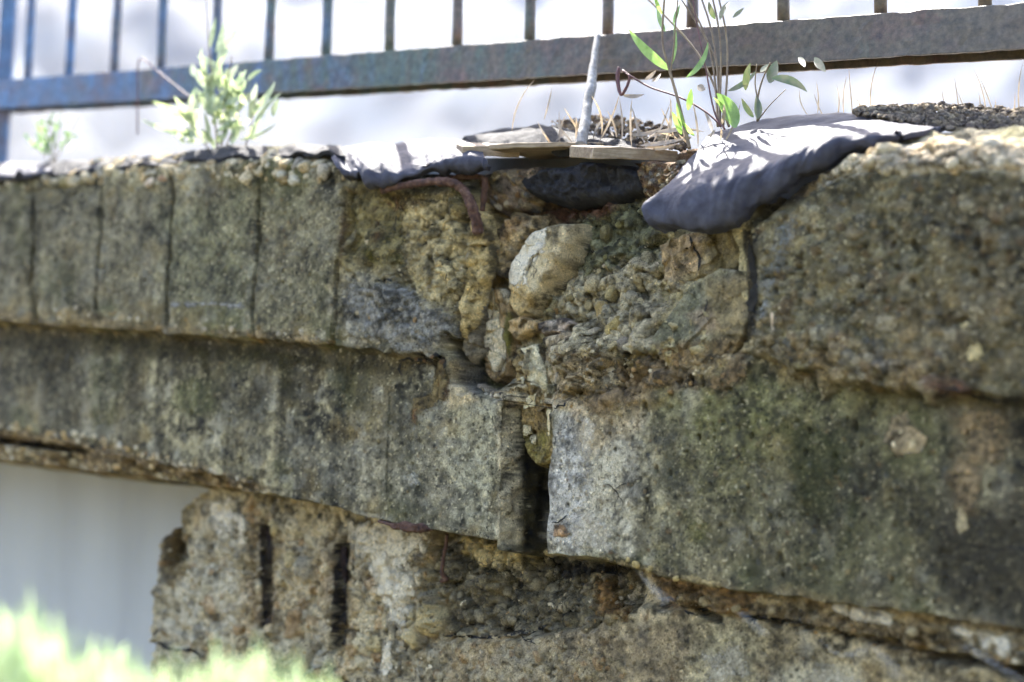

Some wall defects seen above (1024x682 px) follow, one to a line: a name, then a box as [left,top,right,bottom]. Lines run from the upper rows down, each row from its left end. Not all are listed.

corrosion [372,177,489,239]
crack [745,240,758,315]
spalling [347,192,471,414]
spalling [555,205,747,415]
crack [500,400,565,409]
crack [0,438,101,453]
spalling [163,527,186,571]
spalling [553,524,570,537]
spalling [438,547,588,632]
crack [684,608,708,616]
crack [740,614,815,629]